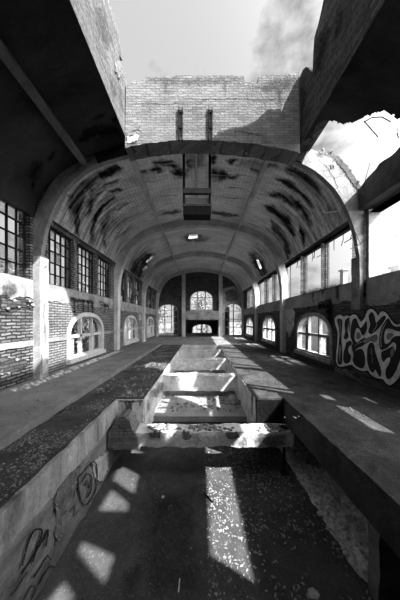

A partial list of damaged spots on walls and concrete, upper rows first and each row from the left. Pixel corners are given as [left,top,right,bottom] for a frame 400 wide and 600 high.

leakage [142,161,177,173]
spalling [318,148,361,190]
leakage [69,165,123,244]
leakage [265,166,321,260]
peeling [1,297,35,310]